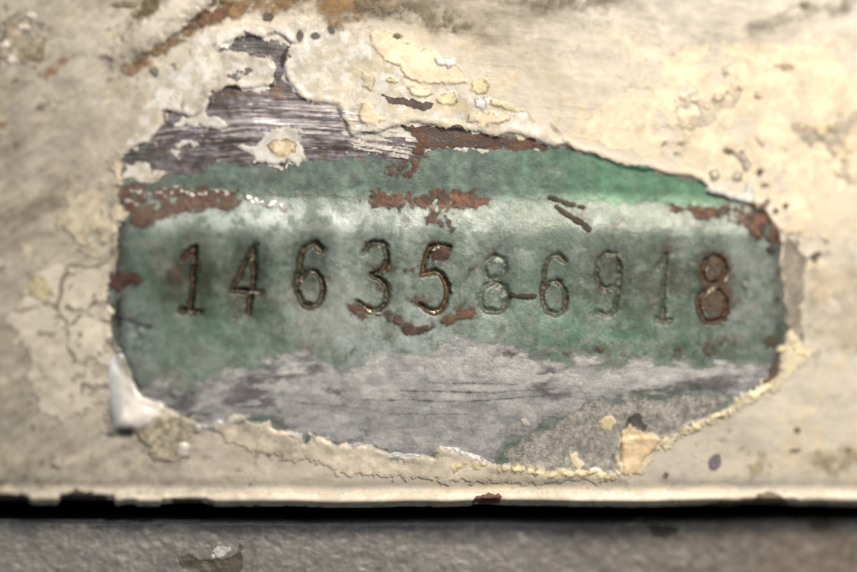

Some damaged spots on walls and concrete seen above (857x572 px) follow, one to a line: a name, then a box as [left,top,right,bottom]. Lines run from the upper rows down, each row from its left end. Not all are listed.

corrosion [318,0,369,28]
corrosion [125,0,298,76]
corrosion [385,138,426,178]
corrosion [116,183,284,228]
corrosion [369,187,490,232]
corrosion [670,202,781,244]
peeling [6,42,857,486]
crack [15,262,112,415]
peeling [59,488,108,501]
peeling [472,492,502,504]